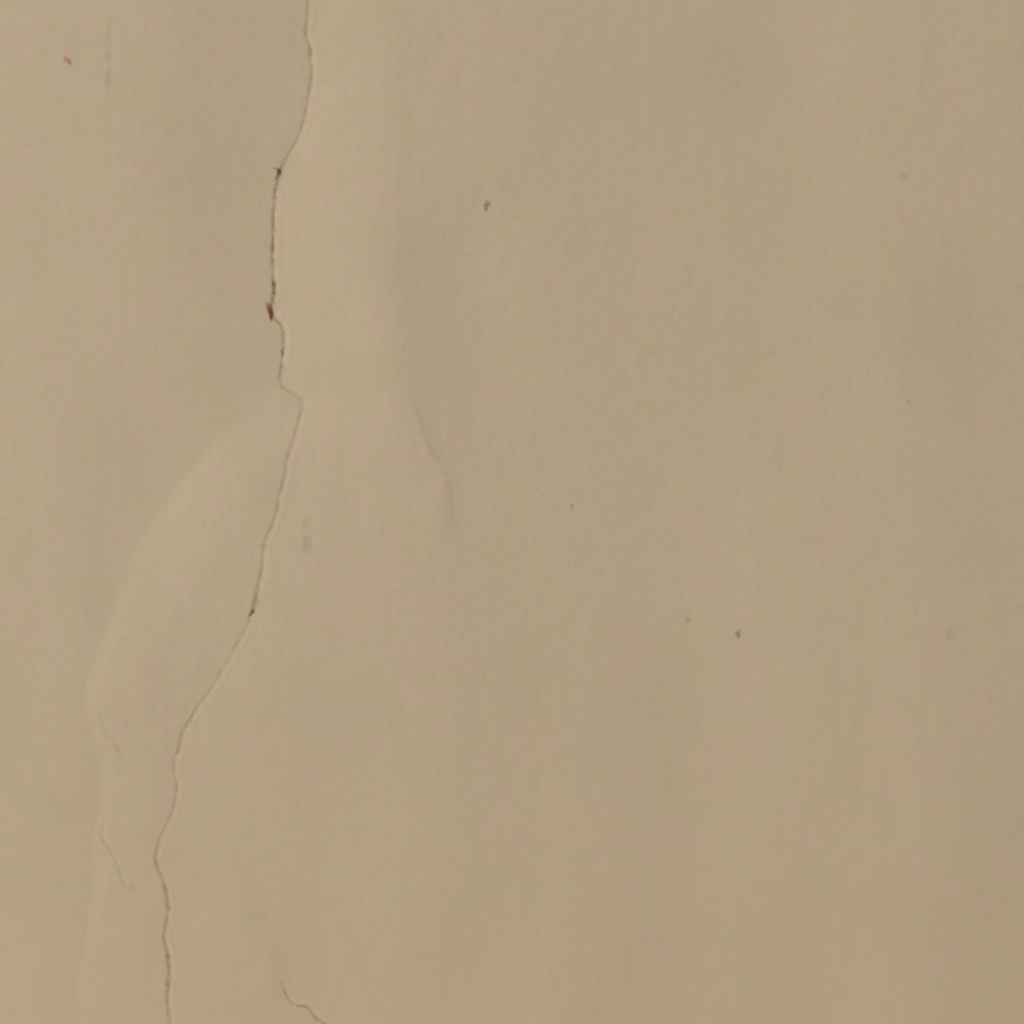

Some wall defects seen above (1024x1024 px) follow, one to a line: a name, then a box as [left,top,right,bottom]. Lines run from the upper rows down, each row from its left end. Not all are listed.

crack [153,0,320,1024]